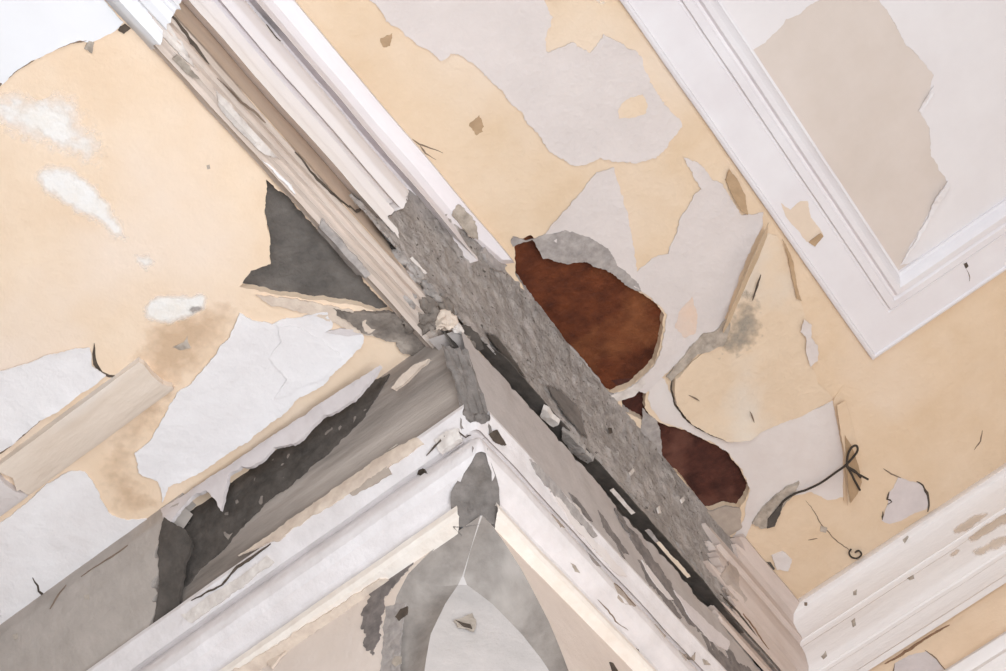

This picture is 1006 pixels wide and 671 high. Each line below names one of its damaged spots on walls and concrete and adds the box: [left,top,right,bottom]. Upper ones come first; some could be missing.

peeling [0,0,131,86]
peeling [879,0,1006,265]
peeling [134,0,843,623]
peeling [0,343,115,454]
peeling [0,470,147,625]
peeling [882,468,930,524]
peeling [232,563,414,671]
peeling [454,613,476,632]